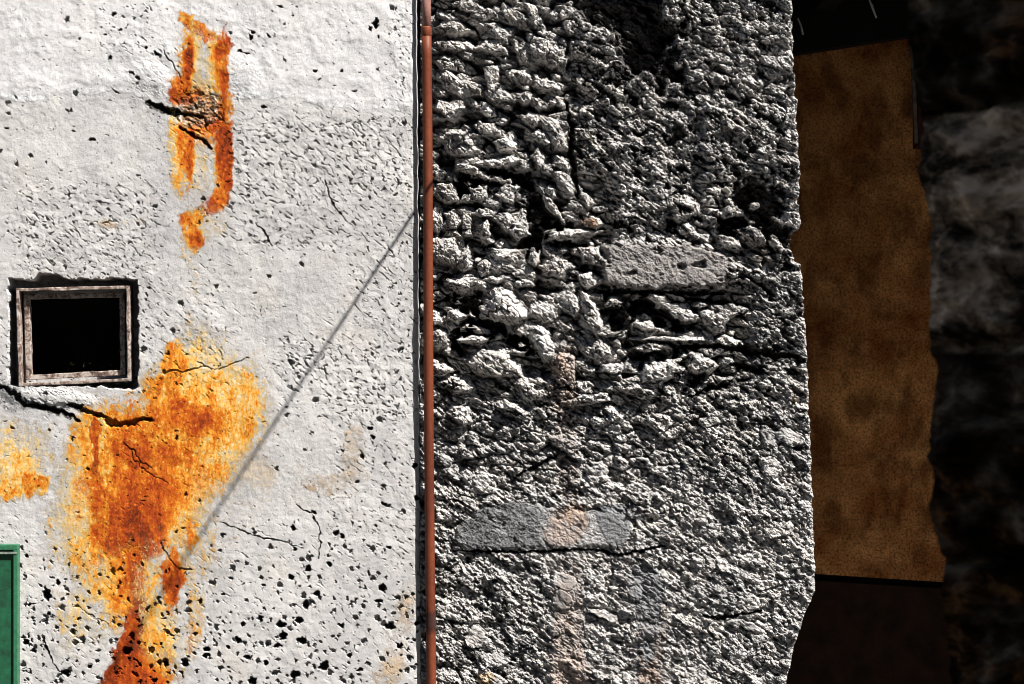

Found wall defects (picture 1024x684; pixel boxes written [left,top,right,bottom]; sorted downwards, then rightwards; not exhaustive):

crack [145,99,213,150]
corrosion [0,11,287,684]
crack [0,386,135,423]
crack [220,504,322,559]